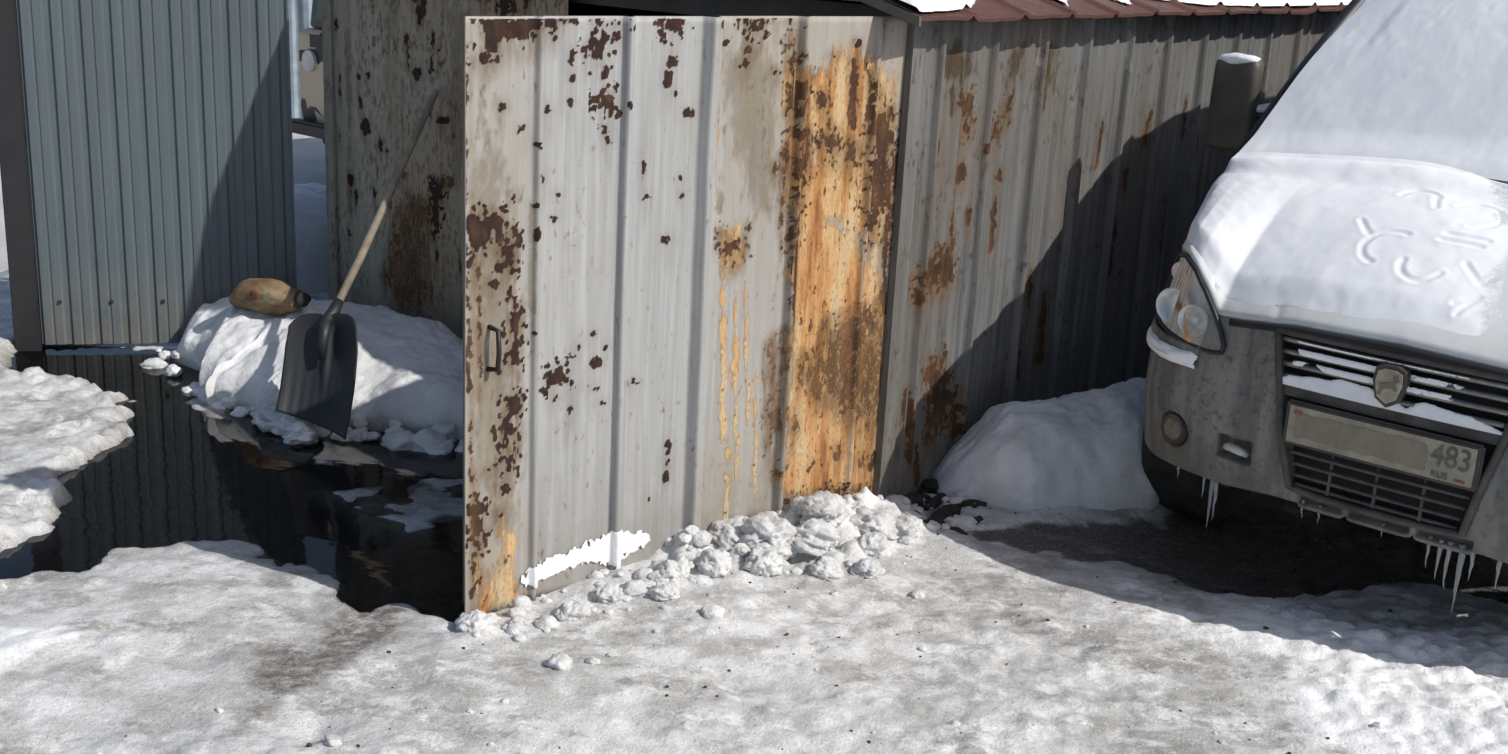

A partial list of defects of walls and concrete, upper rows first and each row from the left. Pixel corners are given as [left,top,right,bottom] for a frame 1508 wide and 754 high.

corrosion [338,72,389,153]
corrosion [944,41,1024,252]
corrosion [347,0,695,613]
corrosion [713,18,901,520]
corrosion [909,207,972,307]
corrosion [1016,268,1047,381]
corrosion [901,341,969,487]